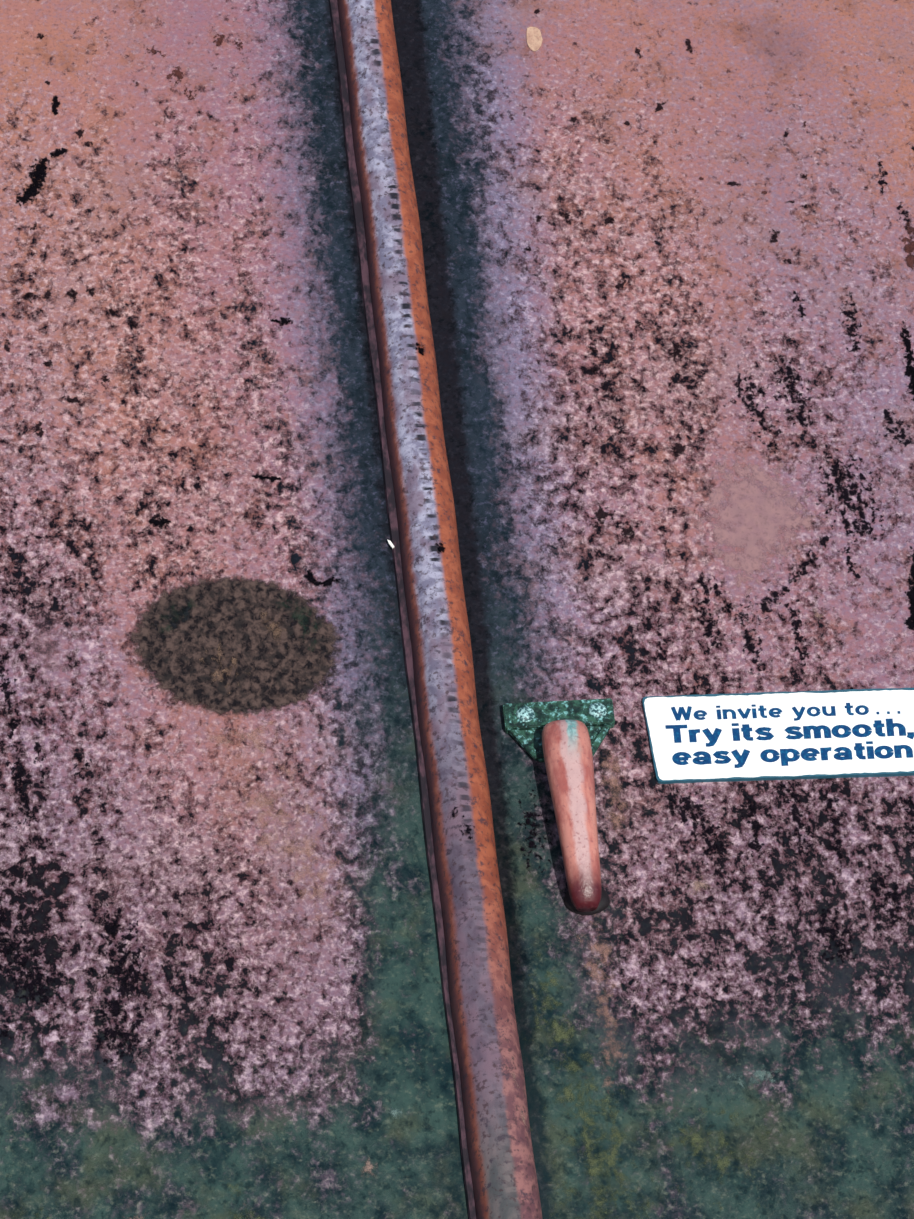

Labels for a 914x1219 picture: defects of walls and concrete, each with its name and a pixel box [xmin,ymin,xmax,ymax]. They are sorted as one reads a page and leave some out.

rust [23,286,95,303]
rust [666,443,686,457]
rust [590,506,639,540]
water stain [303,566,344,587]
crack [905,546,914,630]
water stain [130,576,340,716]
water stain [904,800,914,839]
water stain [866,872,909,925]
water stain [806,904,859,962]
water stain [0,884,64,1043]
water stain [81,898,163,1070]